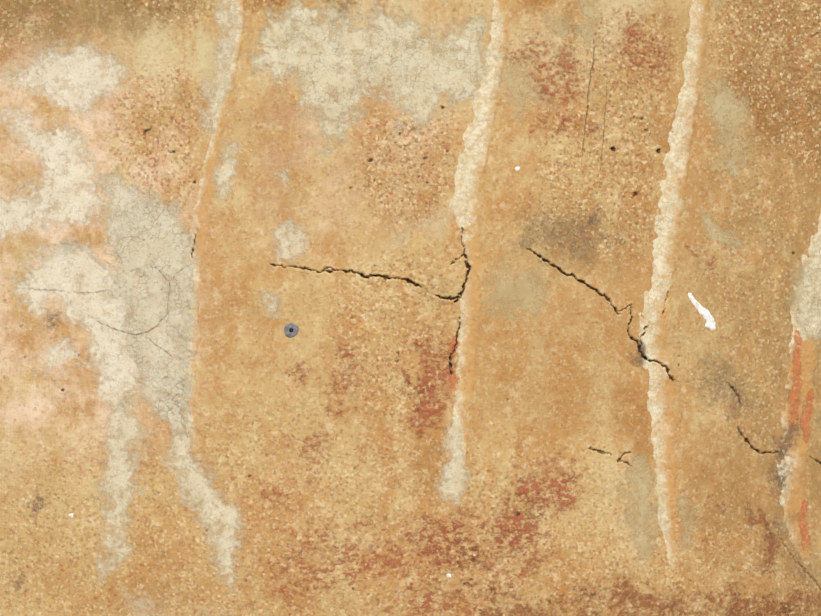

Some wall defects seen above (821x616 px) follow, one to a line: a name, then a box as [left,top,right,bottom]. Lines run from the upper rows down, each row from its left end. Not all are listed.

crack [272,265,419,286]
crack [439,229,471,375]
crack [534,253,673,380]
crack [737,428,775,454]
rust [789,331,814,442]